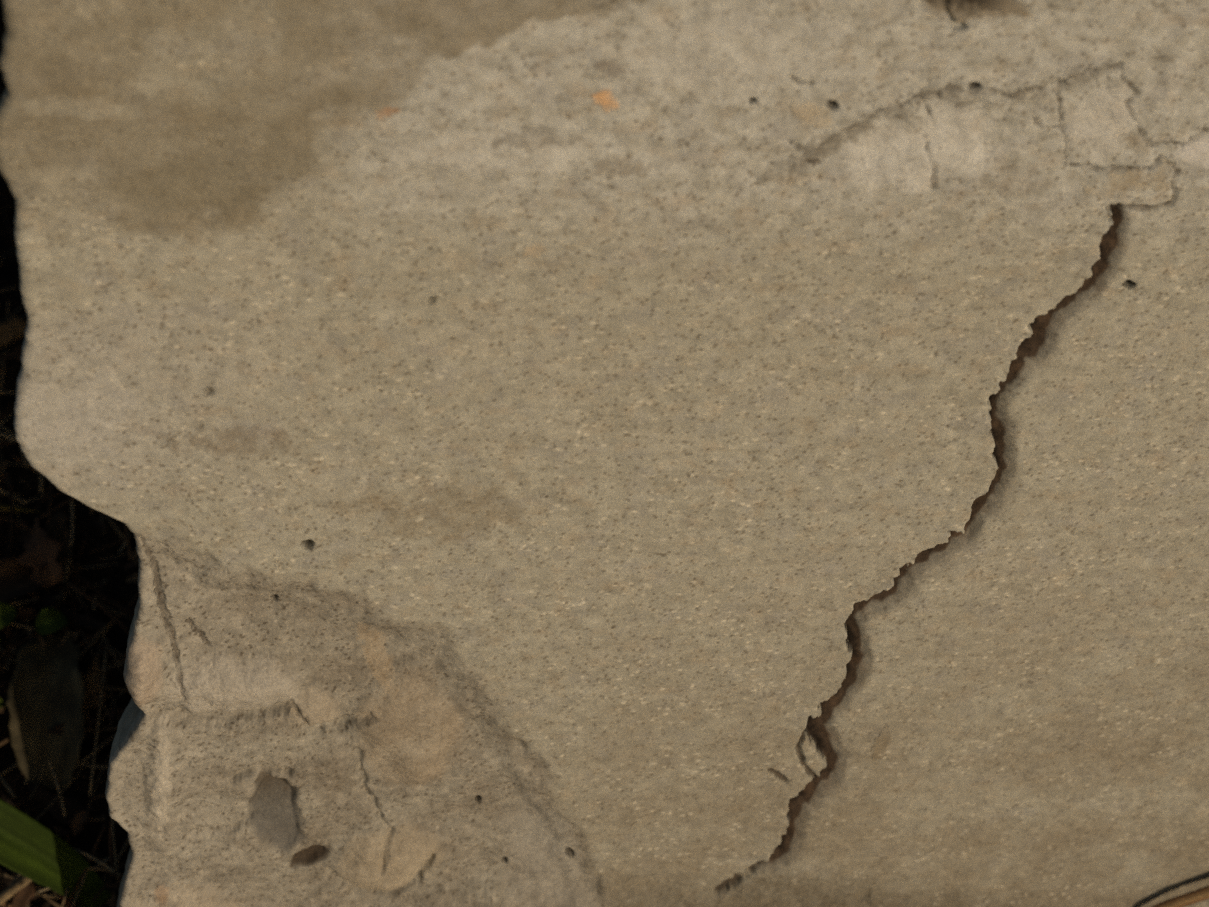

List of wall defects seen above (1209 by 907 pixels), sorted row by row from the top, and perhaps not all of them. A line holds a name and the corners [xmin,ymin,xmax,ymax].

spalling [916,0,1041,26]
crack [715,61,1209,895]
spalling [105,529,614,907]